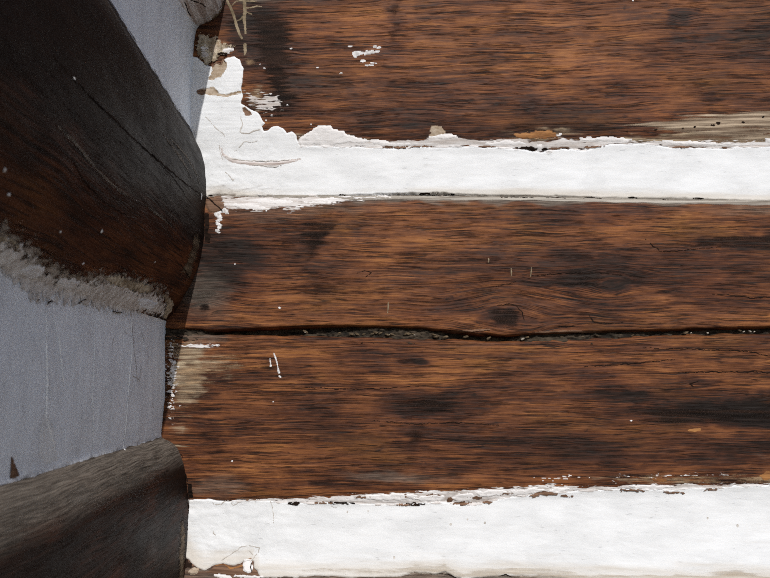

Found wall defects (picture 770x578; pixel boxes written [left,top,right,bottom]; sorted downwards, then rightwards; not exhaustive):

peeling [180,0,266,100]
peeling [206,192,402,214]